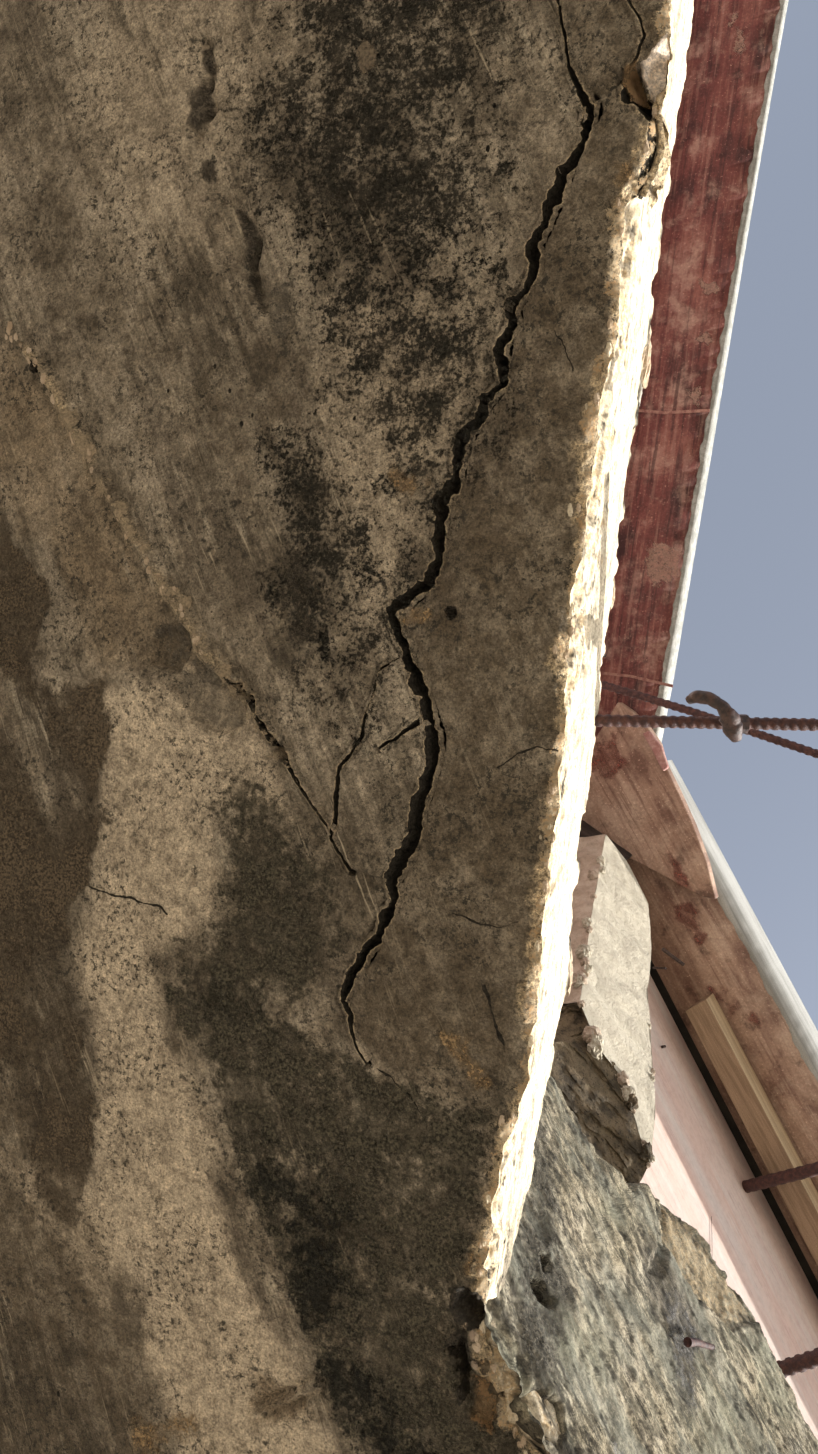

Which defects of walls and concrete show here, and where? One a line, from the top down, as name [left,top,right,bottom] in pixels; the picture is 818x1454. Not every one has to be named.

damp [131,765,522,1454]
damp [217,0,534,757]
crack [222,0,665,1115]
spalling [445,1228,538,1454]
spalling [482,0,672,1207]
rust [591,733,627,778]